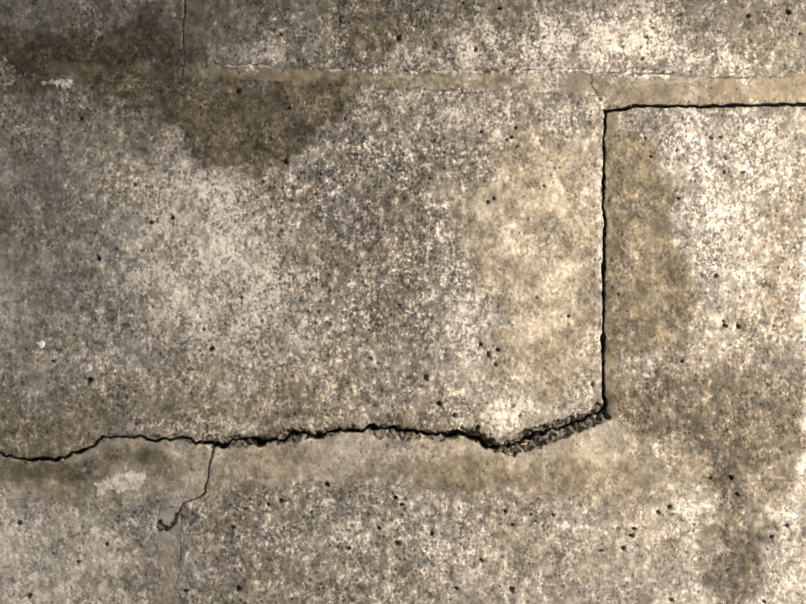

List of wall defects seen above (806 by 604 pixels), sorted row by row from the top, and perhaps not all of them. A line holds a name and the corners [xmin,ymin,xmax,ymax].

leakage [0,0,797,413]
crack [0,74,806,529]
leakage [607,361,806,604]